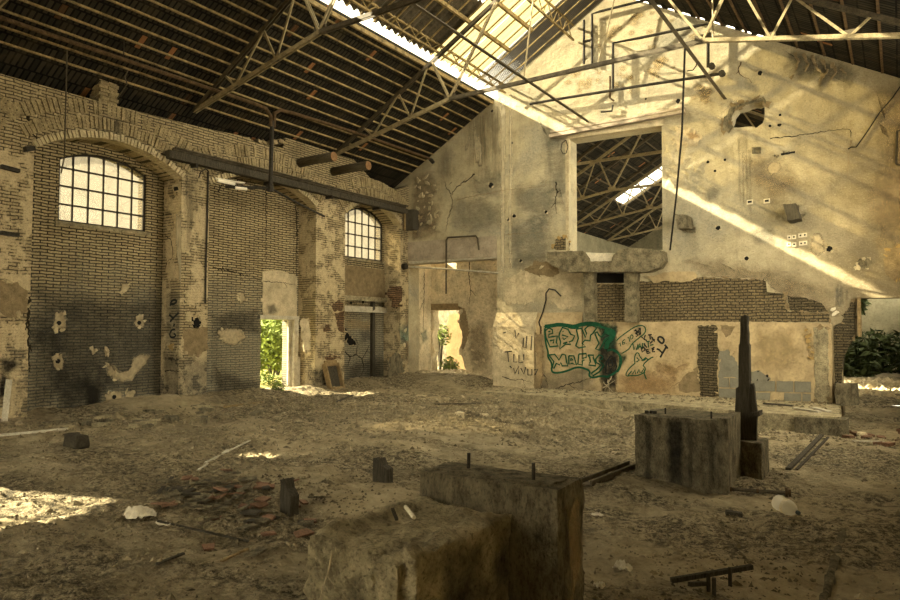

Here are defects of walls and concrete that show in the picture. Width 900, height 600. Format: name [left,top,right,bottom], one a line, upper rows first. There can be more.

spalling [720,95,771,135]
crack [445,174,559,227]
flaking render [0,278,32,321]
flaking render [597,283,625,322]
spalling [457,308,488,364]
flaking render [639,276,857,403]
peeling [89,346,135,395]